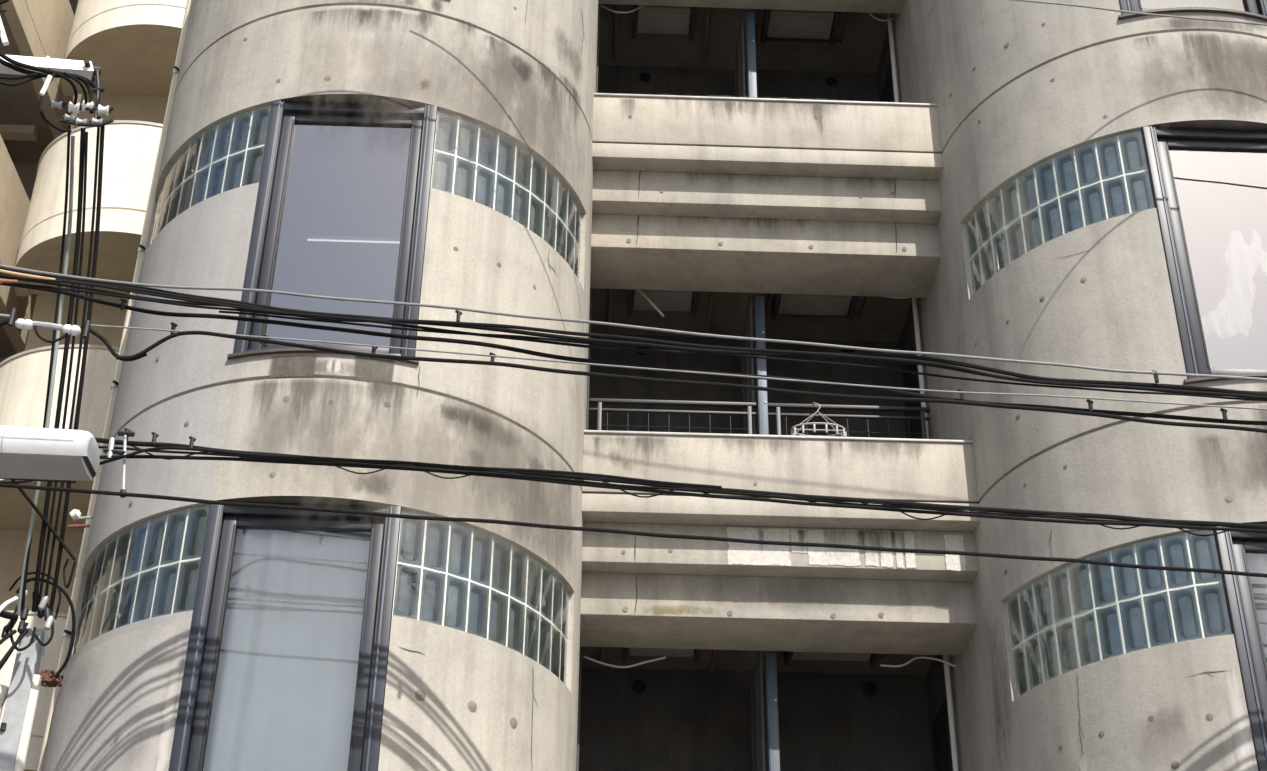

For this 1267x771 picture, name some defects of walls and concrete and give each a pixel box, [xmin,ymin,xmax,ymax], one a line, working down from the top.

water stain [345,0,394,17]
water stain [500,60,577,102]
water stain [262,355,403,400]
water stain [448,411,512,440]
peeling [726,526,916,568]
peeling [944,534,966,571]
crack [1076,673,1084,756]